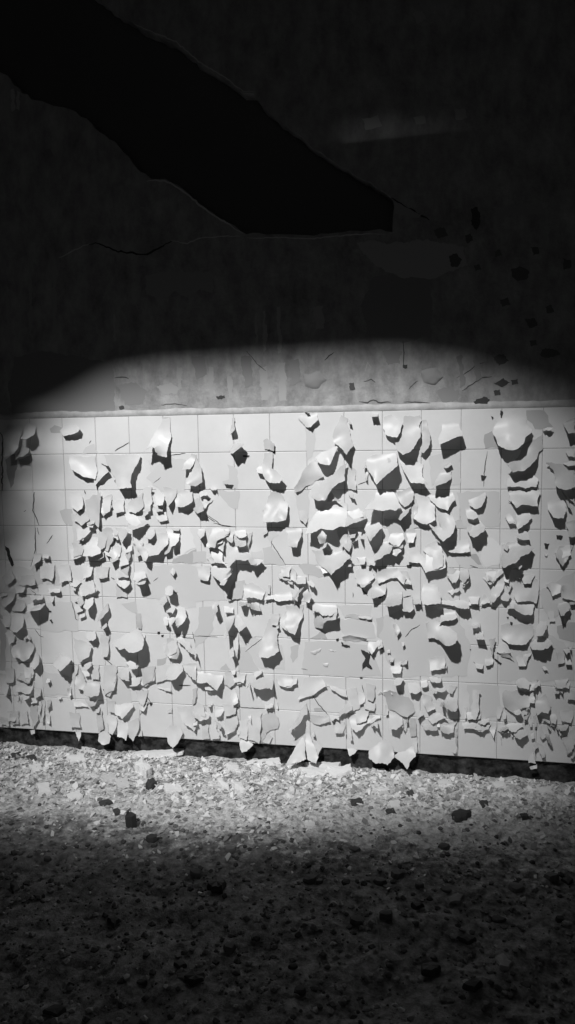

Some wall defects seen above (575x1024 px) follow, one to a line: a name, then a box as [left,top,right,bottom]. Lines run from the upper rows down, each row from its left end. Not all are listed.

spalling [0,0,394,236]
crack [59,179,376,258]
peeling [0,410,575,771]